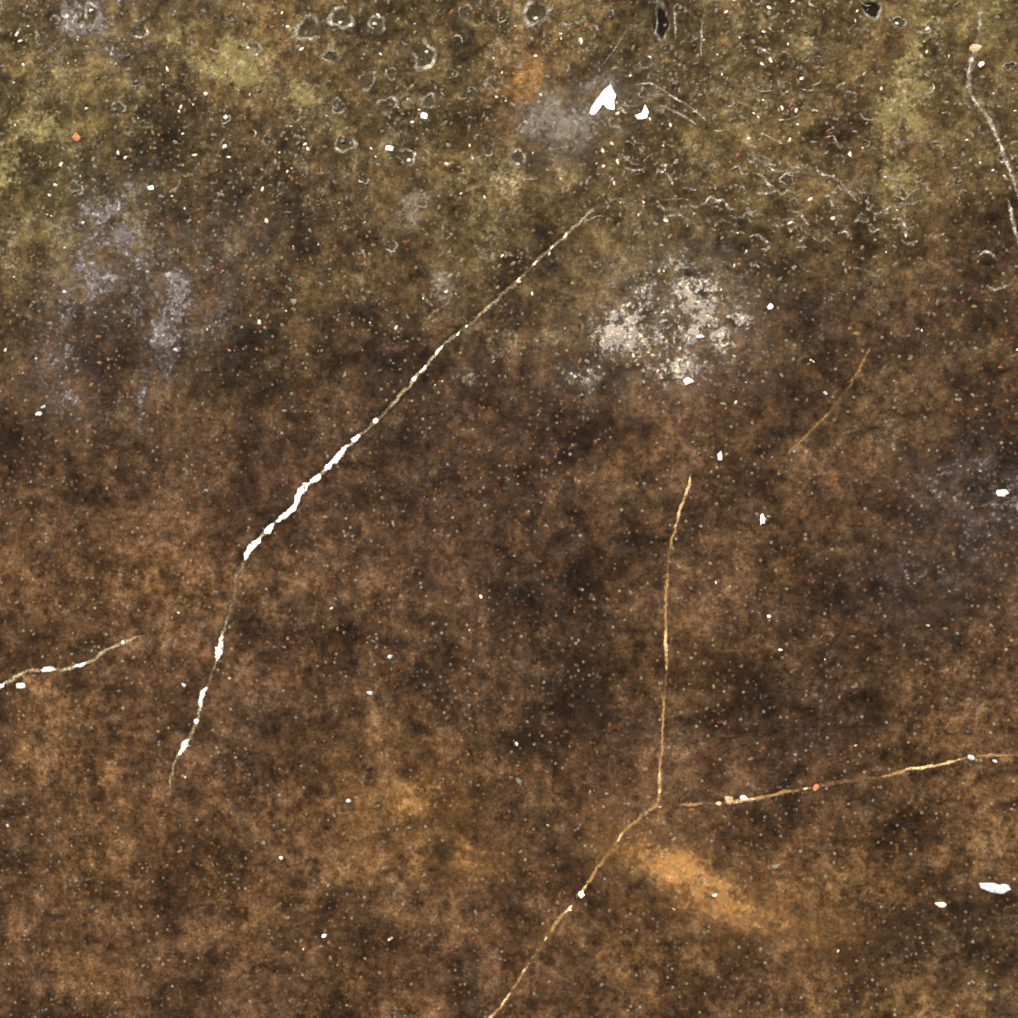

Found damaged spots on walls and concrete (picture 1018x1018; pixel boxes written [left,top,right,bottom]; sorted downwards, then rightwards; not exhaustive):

crack [967,53,1018,242]
leakage [564,245,760,396]
crack [234,210,593,579]
crack [670,475,691,548]
crack [0,636,137,690]
crack [215,617,228,661]
crack [662,573,670,670]
crack [169,687,207,784]
crack [488,697,1011,1018]